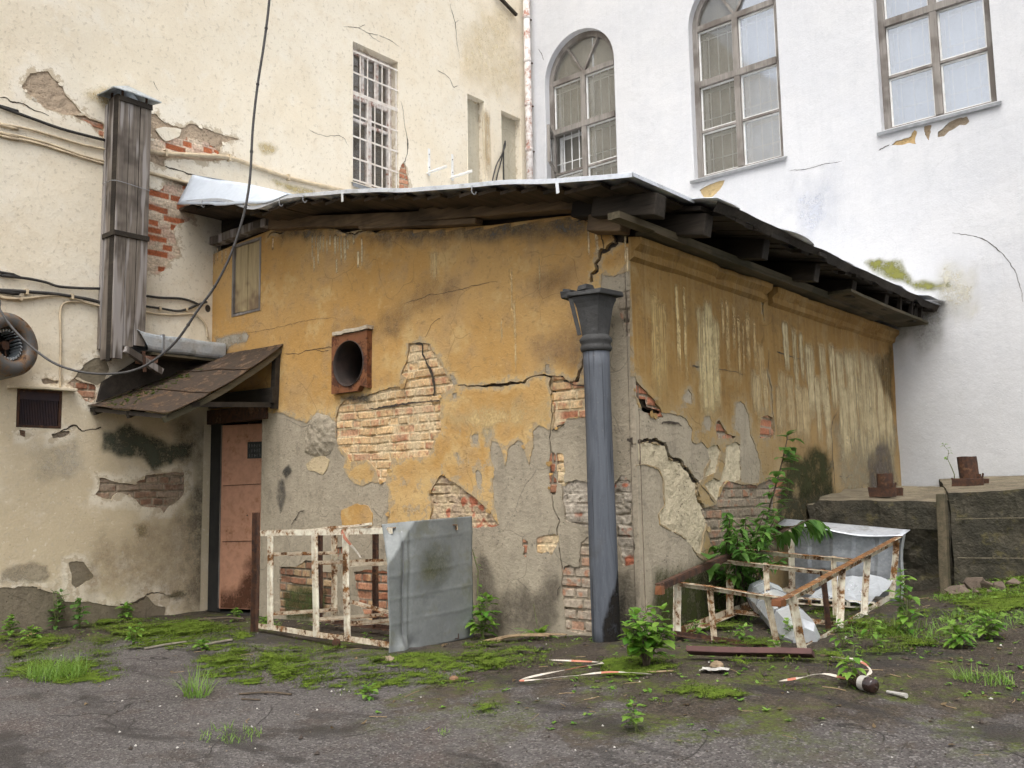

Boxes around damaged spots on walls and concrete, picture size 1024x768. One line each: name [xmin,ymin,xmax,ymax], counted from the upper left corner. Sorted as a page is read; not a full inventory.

flaking render [22,72,104,138]
flaking render [150,114,239,167]
flaking render [147,182,195,275]
crack [577,220,627,282]
crack [955,233,1023,301]
crack [60,424,101,432]
flaking render [95,472,184,513]
peeling [259,342,457,625]
peeling [429,364,592,637]
crack [460,370,584,392]
peeling [601,271,788,634]
water stain [651,287,896,531]